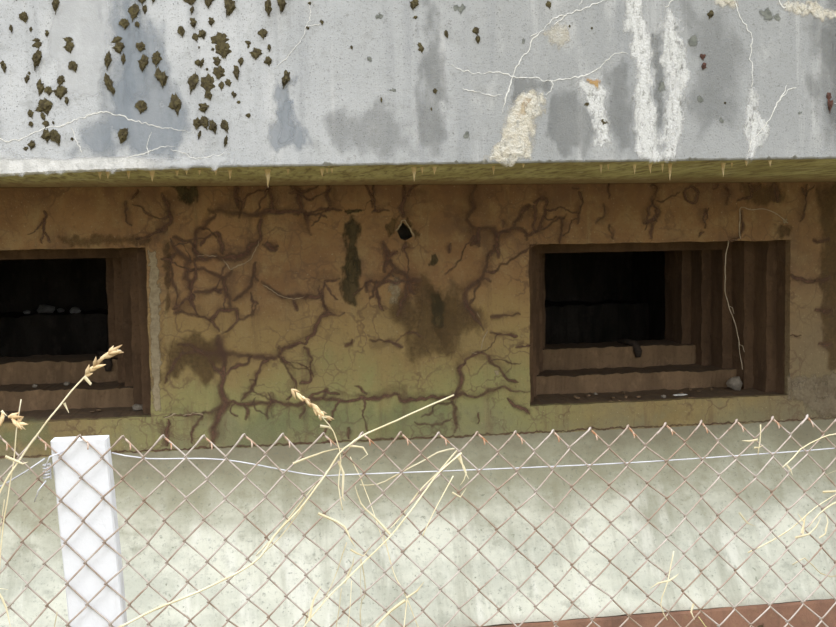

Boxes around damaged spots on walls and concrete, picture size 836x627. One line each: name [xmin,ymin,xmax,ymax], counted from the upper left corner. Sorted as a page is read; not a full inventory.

damp [50,0,234,170]
damp [270,87,305,150]
damp [489,79,549,166]
crack [450,0,625,112]
damp [623,0,690,161]
crack [735,3,753,86]
damp [743,89,770,158]
crack [748,85,796,152]
crack [28,210,50,243]
damp [339,209,362,306]
spalling [396,220,414,240]
crack [111,182,836,453]